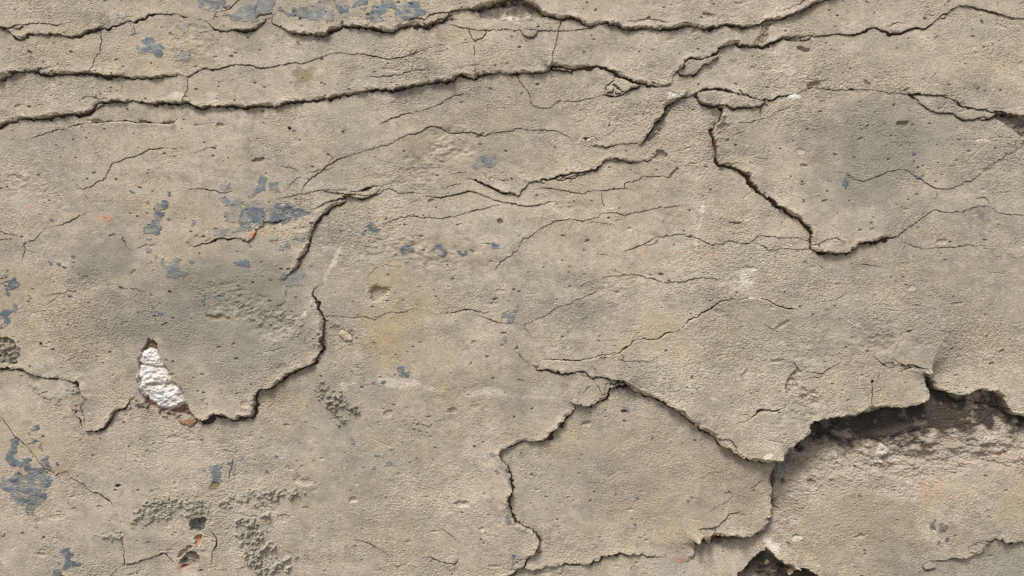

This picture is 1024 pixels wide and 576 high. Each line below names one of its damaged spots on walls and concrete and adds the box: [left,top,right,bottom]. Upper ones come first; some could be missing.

crack [0,0,1024,433]
crack [1,417,244,576]
flaking render [133,340,198,427]
crack [357,518,459,572]
crack [485,293,847,576]
spalling [737,358,1024,576]
crack [919,537,1023,573]